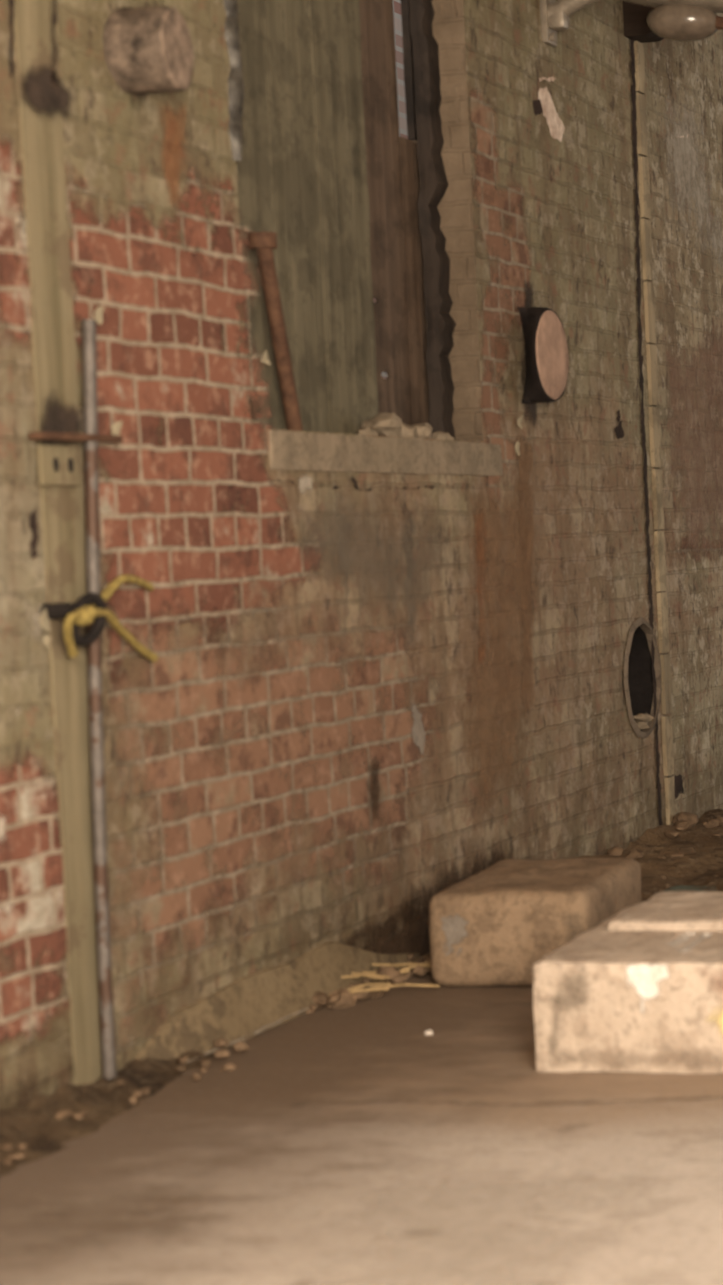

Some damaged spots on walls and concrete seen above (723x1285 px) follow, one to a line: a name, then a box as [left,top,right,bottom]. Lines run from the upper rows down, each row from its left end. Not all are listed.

flaking render [0,136,32,348]
flaking render [65,165,440,986]
flaking render [0,754,68,1043]